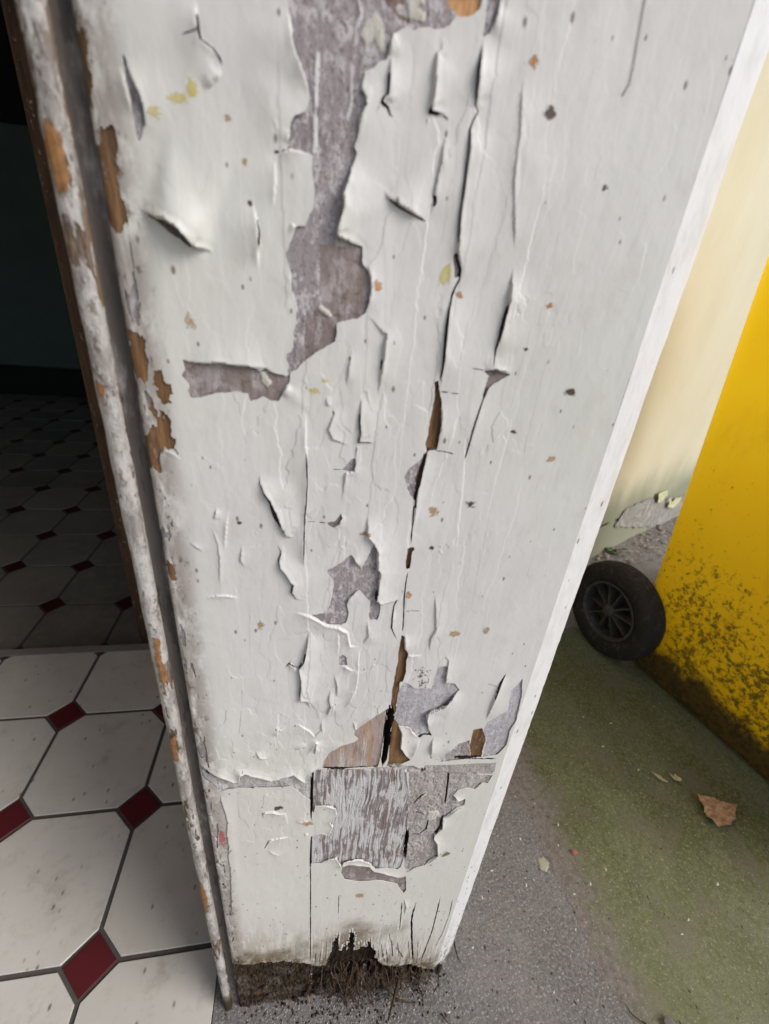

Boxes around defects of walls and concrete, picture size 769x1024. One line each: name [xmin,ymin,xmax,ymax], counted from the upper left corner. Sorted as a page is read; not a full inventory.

peeling [182,0,517,405]
peeling [160,449,179,462]
peeling [204,476,523,892]
crack [309,32,536,962]
damp [331,925,368,949]